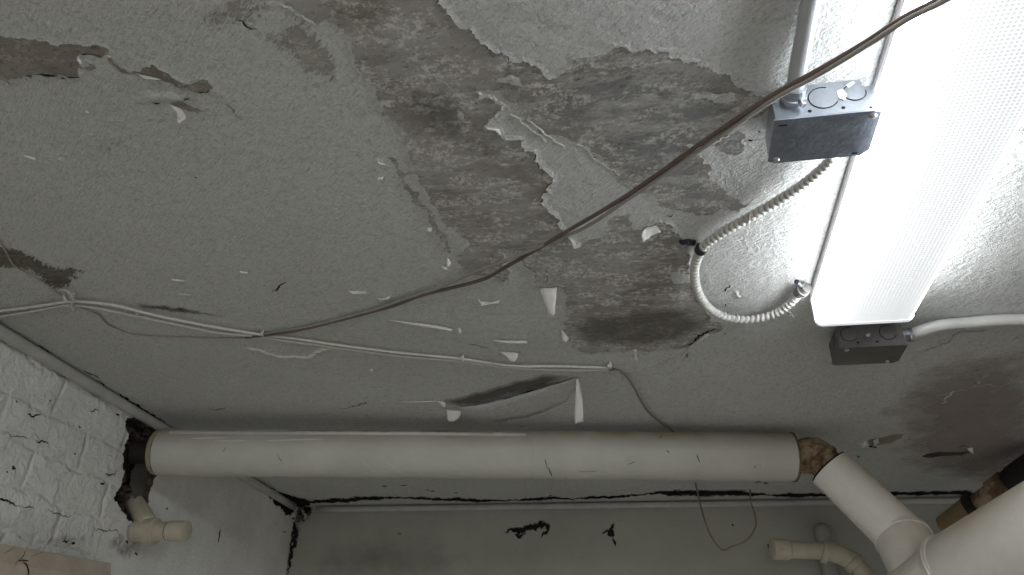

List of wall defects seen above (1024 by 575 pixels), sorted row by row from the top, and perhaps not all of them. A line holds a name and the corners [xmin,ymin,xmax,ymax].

peeling [0,32,244,124]
peeling [203,0,770,362]
peeling [0,247,84,289]
crack [0,498,119,535]
spalling [114,413,157,523]
crack [287,481,826,575]
crack [890,489,972,497]